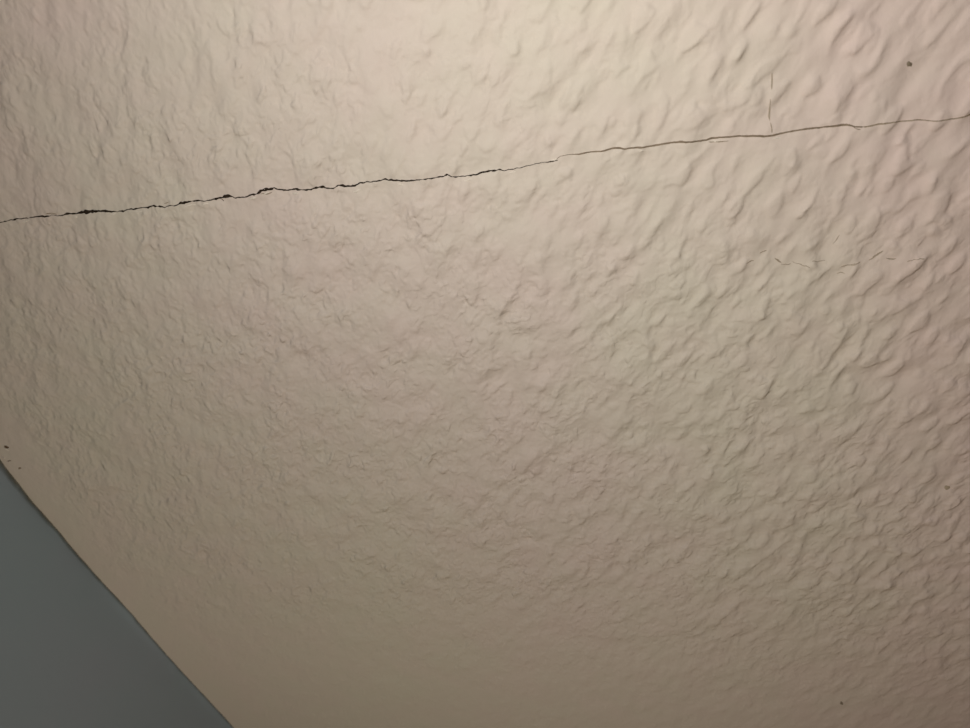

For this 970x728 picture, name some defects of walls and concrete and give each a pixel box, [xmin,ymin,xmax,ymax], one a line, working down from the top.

crack [0,74,970,223]